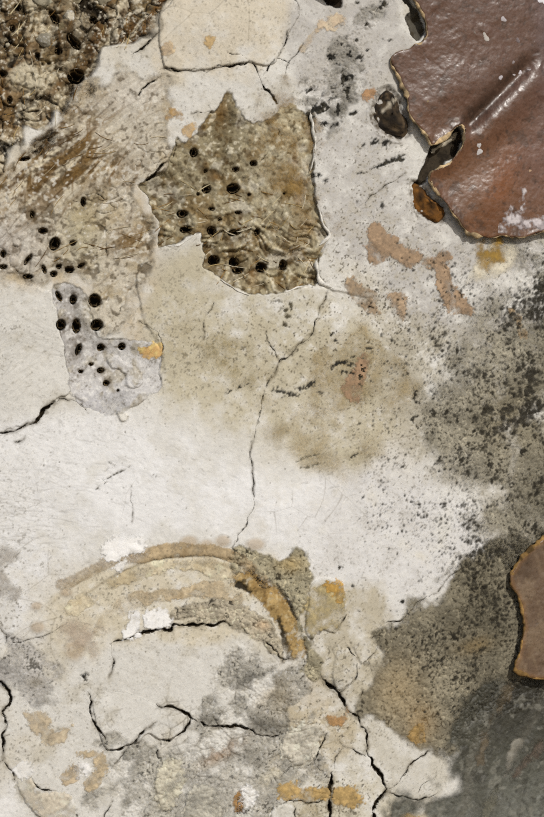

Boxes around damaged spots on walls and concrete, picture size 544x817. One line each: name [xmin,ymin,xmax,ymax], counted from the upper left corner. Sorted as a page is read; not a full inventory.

leakage [306,53,357,127]
spalling [327,37,362,132]
spalling [0,63,333,416]
rust [412,183,445,223]
crack [1,398,86,434]
flaking render [101,535,147,577]
leakage [272,242,544,817]
crack [0,681,15,777]
crack [112,621,231,668]
crack [89,695,279,769]
spalling [94,545,328,817]
crack [280,570,460,817]